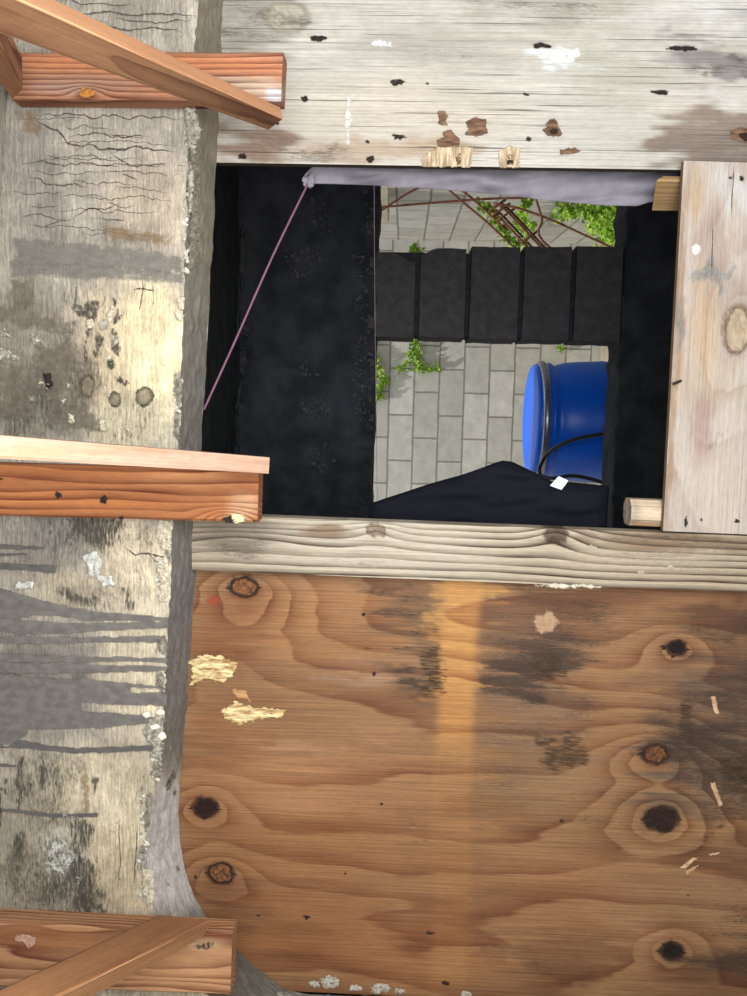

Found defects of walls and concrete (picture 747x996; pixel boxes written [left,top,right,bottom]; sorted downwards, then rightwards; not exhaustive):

crack [72,0,192,33]
crack [13,113,182,237]
damp [68,517,128,548]
damp [420,645,448,697]
damp [0,587,169,913]
damp [535,733,590,771]